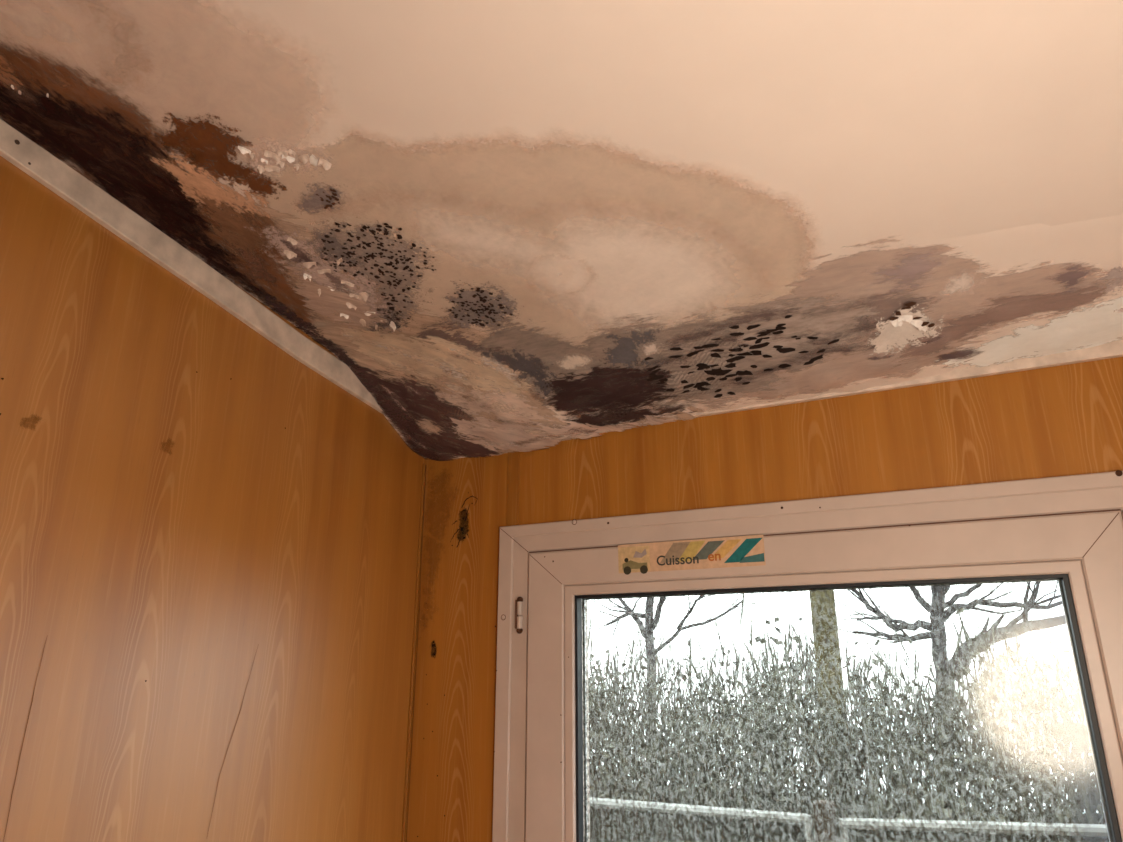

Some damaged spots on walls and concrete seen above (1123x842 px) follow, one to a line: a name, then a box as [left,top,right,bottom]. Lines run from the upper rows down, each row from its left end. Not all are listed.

water stain [0,0,1123,428]
peeling [866,302,943,360]
peeling [935,297,1123,368]